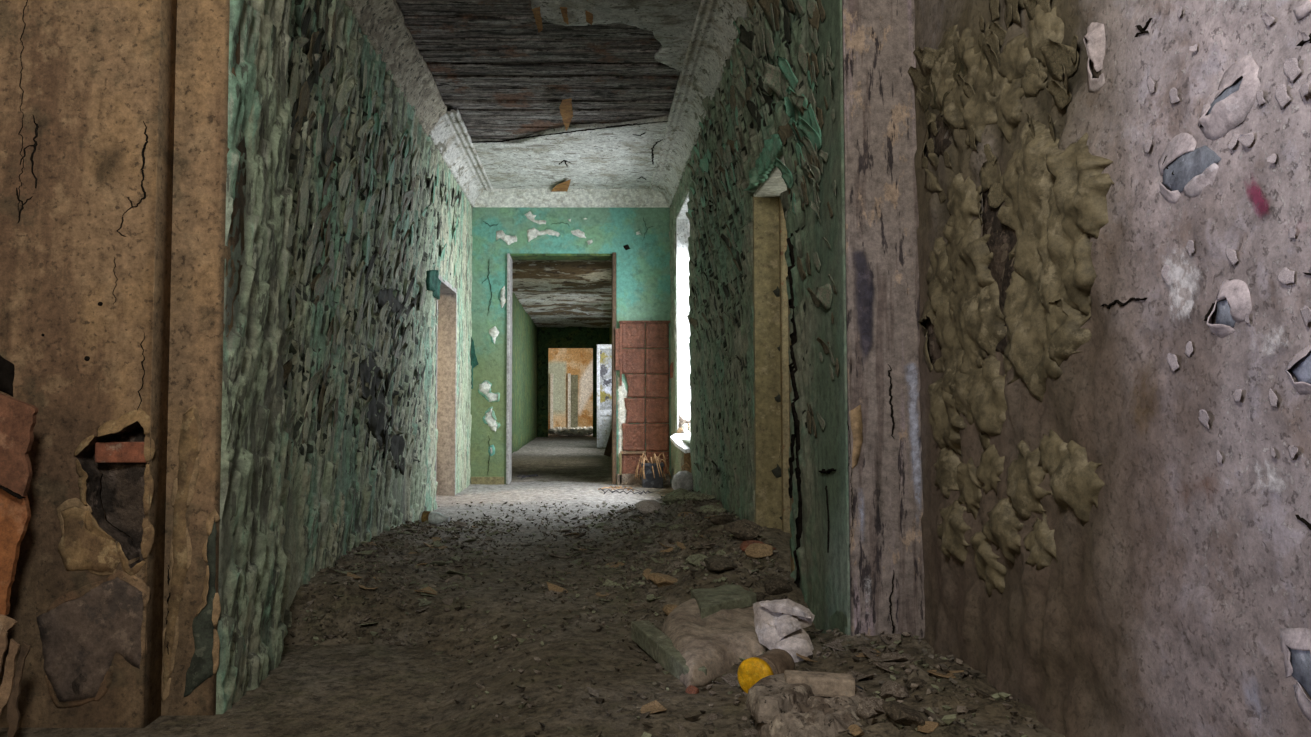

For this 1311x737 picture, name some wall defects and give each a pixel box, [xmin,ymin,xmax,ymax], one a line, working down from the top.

crack [16,0,39,223]
spalling [396,0,680,140]
peeling [1144,54,1311,203]
spalling [282,0,463,478]
peeling [496,210,594,248]
peeling [677,0,839,489]
peeling [1167,341,1193,372]
peeling [1206,248,1252,338]
peeling [1277,267,1311,285]
peeling [1285,345,1311,394]
peeling [37,405,221,708]
peeling [1279,628,1311,722]